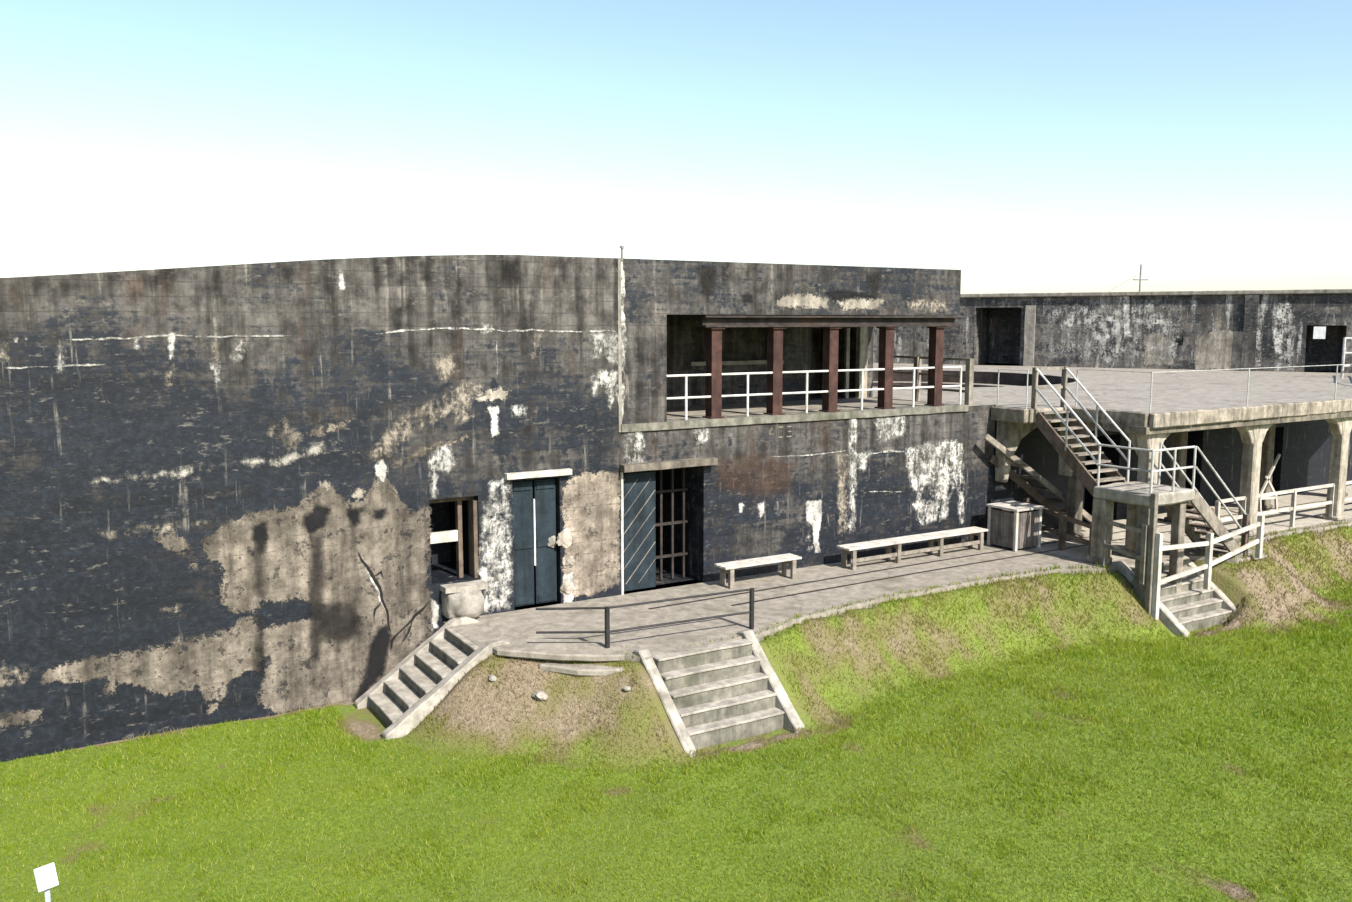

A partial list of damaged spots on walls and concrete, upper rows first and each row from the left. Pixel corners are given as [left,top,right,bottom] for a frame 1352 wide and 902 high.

leakage [1050,296,1183,363]
leakage [1255,303,1296,371]
leakage [454,403,525,437]
leakage [429,445,454,497]
spalling [0,354,482,714]
leakage [253,523,268,588]
leakage [304,506,358,661]
crack [358,552,429,649]
leakage [431,600,439,628]
peeling [479,480,512,612]
spalling [547,471,621,603]
leakage [353,625,391,703]